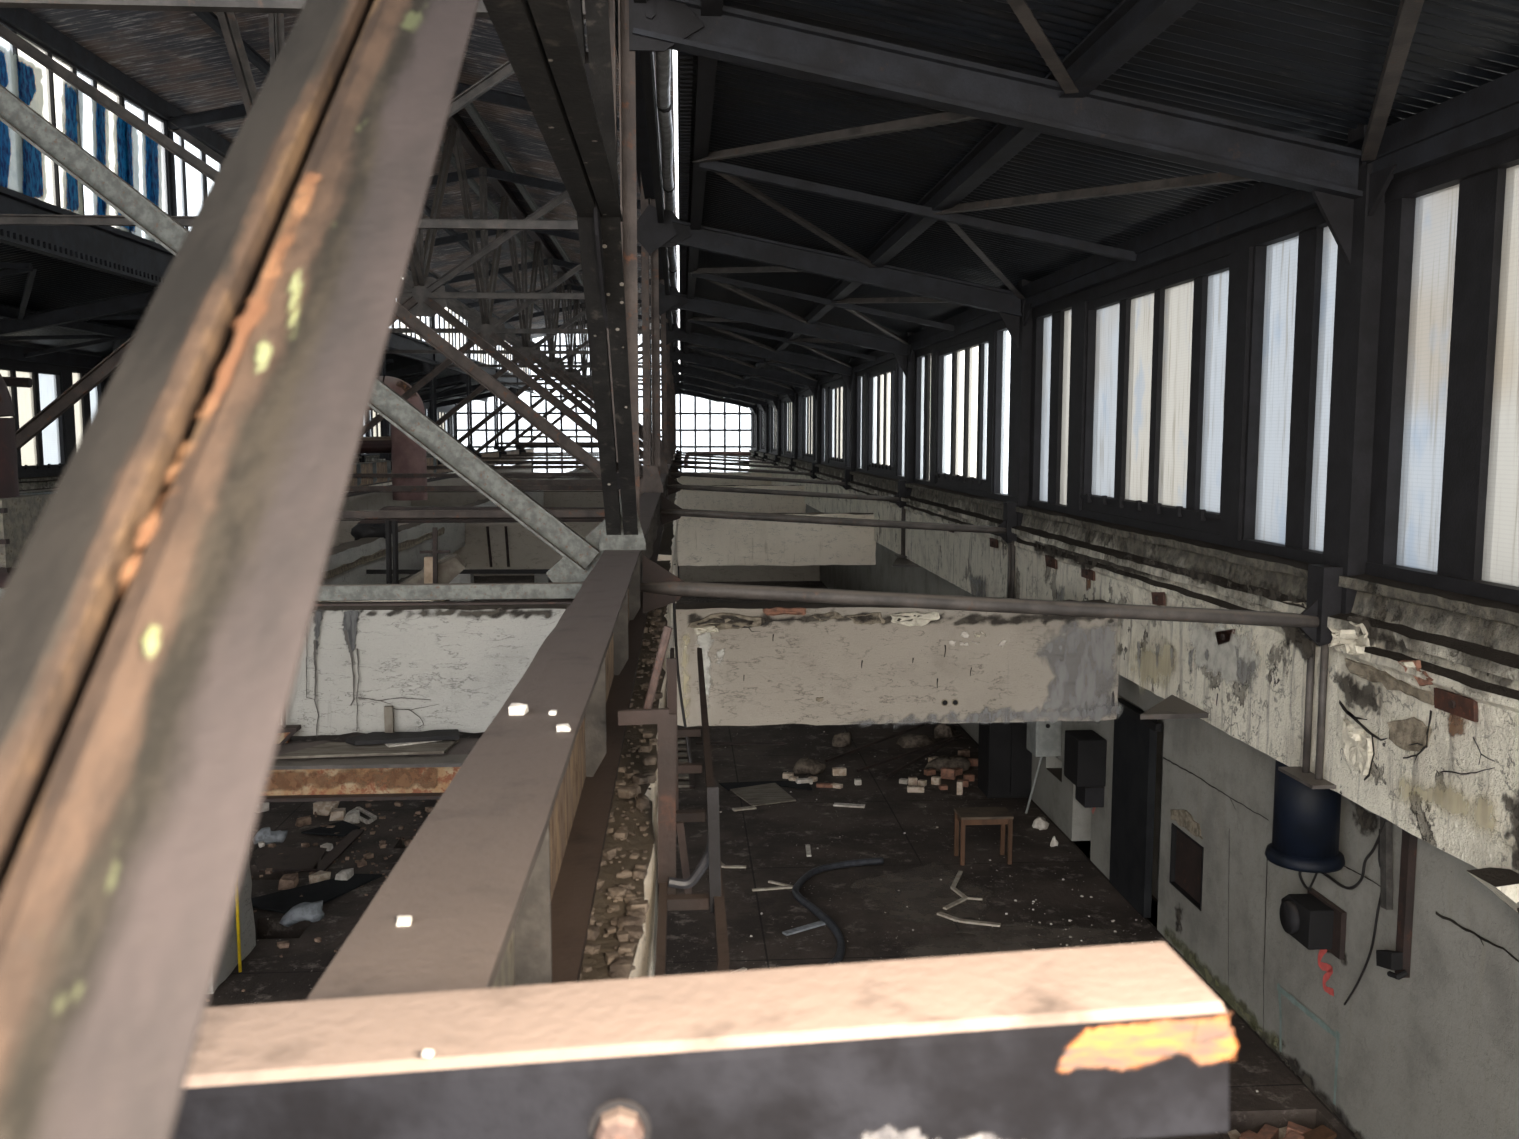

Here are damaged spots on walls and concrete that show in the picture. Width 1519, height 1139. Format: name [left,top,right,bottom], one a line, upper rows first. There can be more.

corrosion [204,173,321,415]
corrosion [123,511,157,582]
peeling [1328,621,1434,776]
corrosion [265,768,437,791]
crack [1436,911,1519,962]